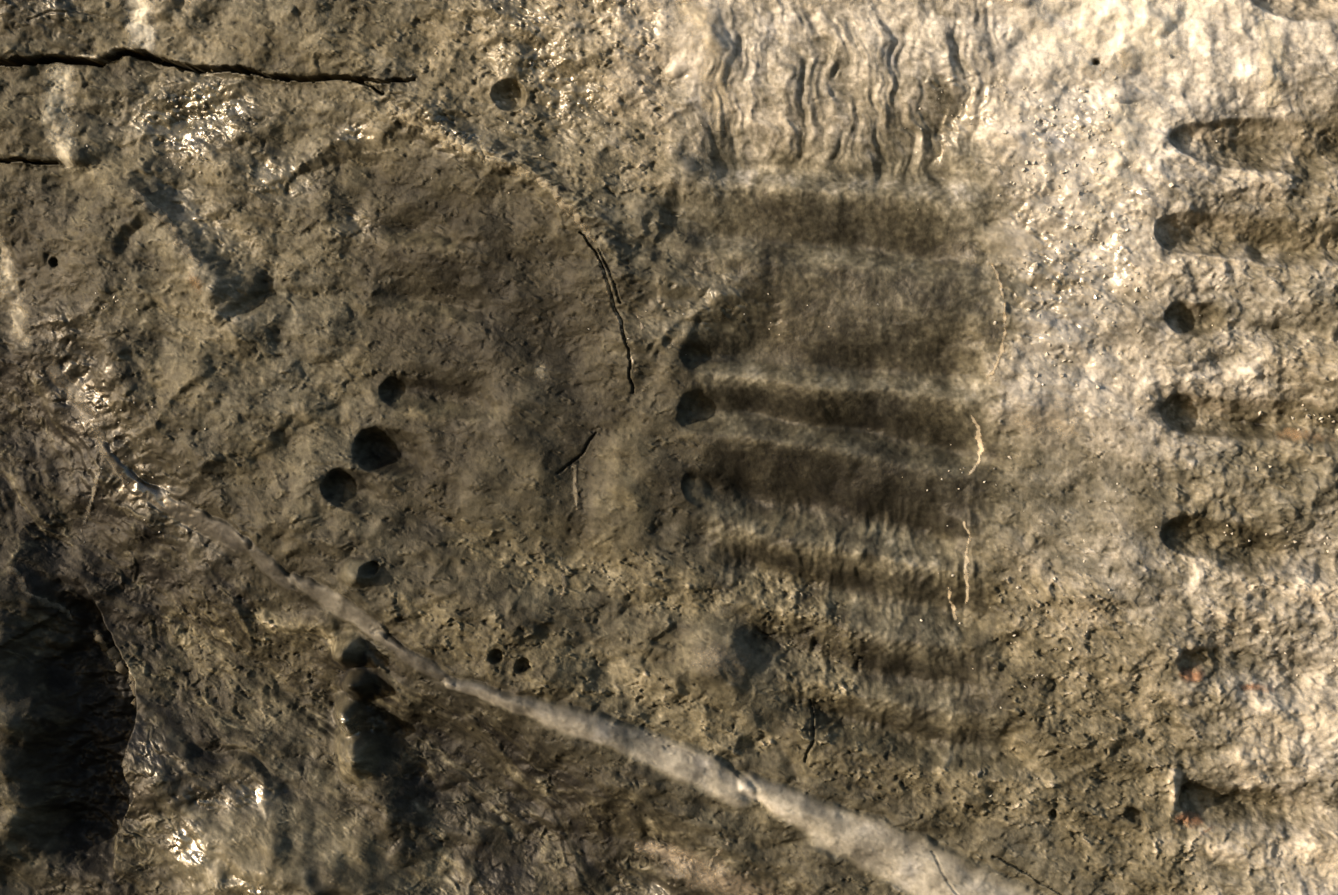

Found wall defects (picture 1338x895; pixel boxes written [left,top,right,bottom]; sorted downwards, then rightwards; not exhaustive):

crack [0,10,417,95]
crack [0,157,60,165]
crack [581,233,643,395]